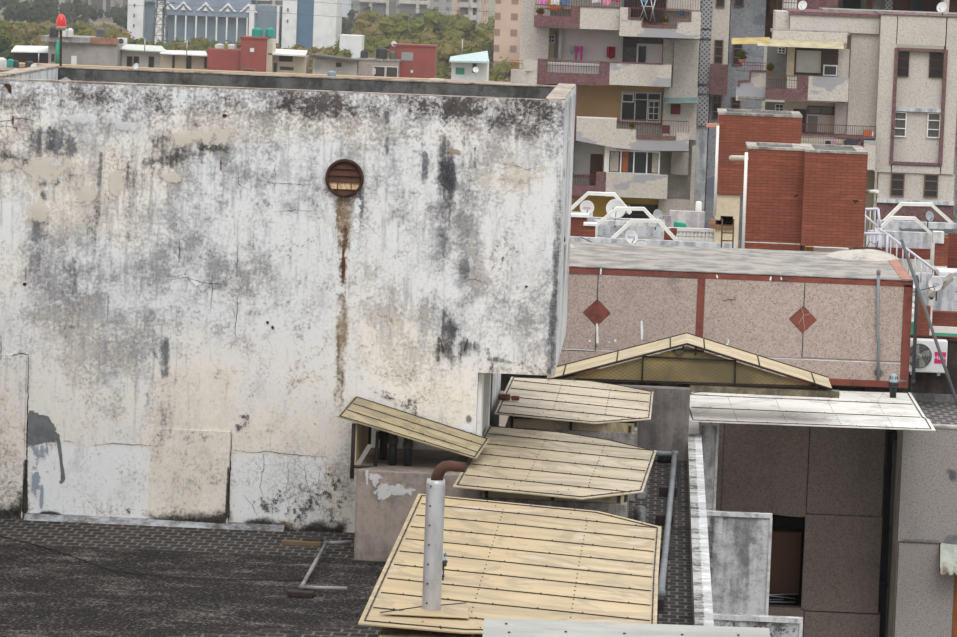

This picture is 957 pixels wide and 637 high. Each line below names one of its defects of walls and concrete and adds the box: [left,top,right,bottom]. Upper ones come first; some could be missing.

damp [31,127,77,156]
damp [275,90,351,119]
damp [473,95,554,133]
damp [422,137,476,213]
rust [336,197,353,283]
damp [518,207,571,380]
rust [337,308,347,400]
damp [436,309,504,372]
crack [228,433,321,522]
damp [246,473,347,533]
damp [709,516,728,574]
damp [748,621,795,637]